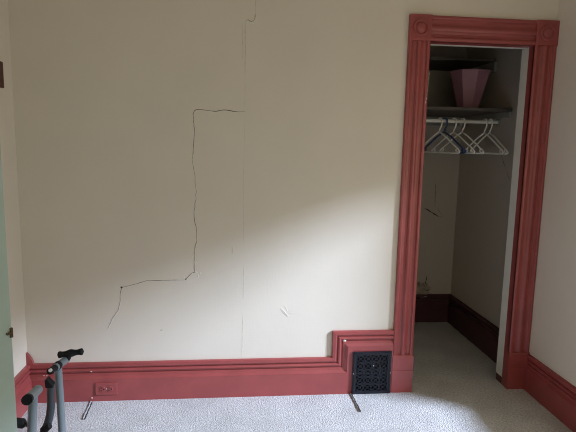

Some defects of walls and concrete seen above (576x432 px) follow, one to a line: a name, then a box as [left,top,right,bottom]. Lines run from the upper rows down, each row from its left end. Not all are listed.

crack [107,108,246,329]